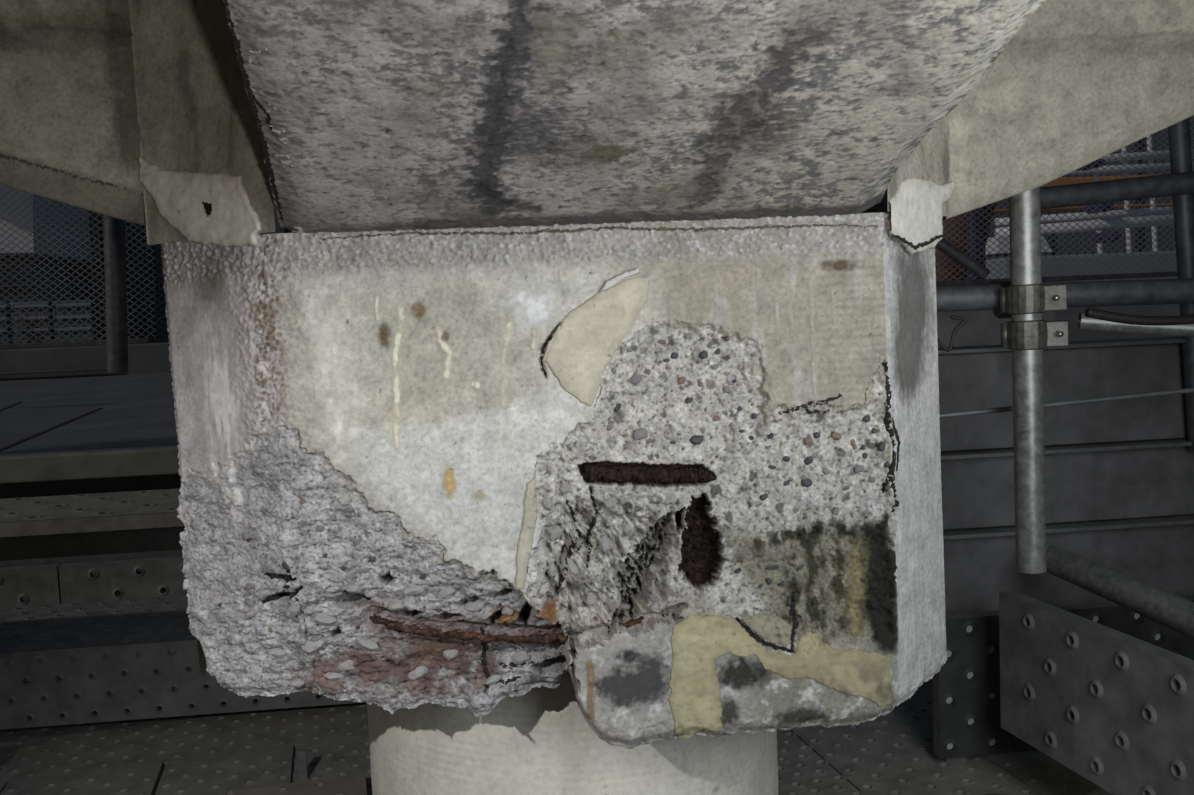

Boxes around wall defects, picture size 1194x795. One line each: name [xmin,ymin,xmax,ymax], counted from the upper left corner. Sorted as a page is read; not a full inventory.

water stain [380,0,883,231]
spalling [177,268,899,723]
crack [882,362,901,526]
corrosion [301,629,499,693]
corrosion [495,608,519,623]
corrosion [540,599,557,622]